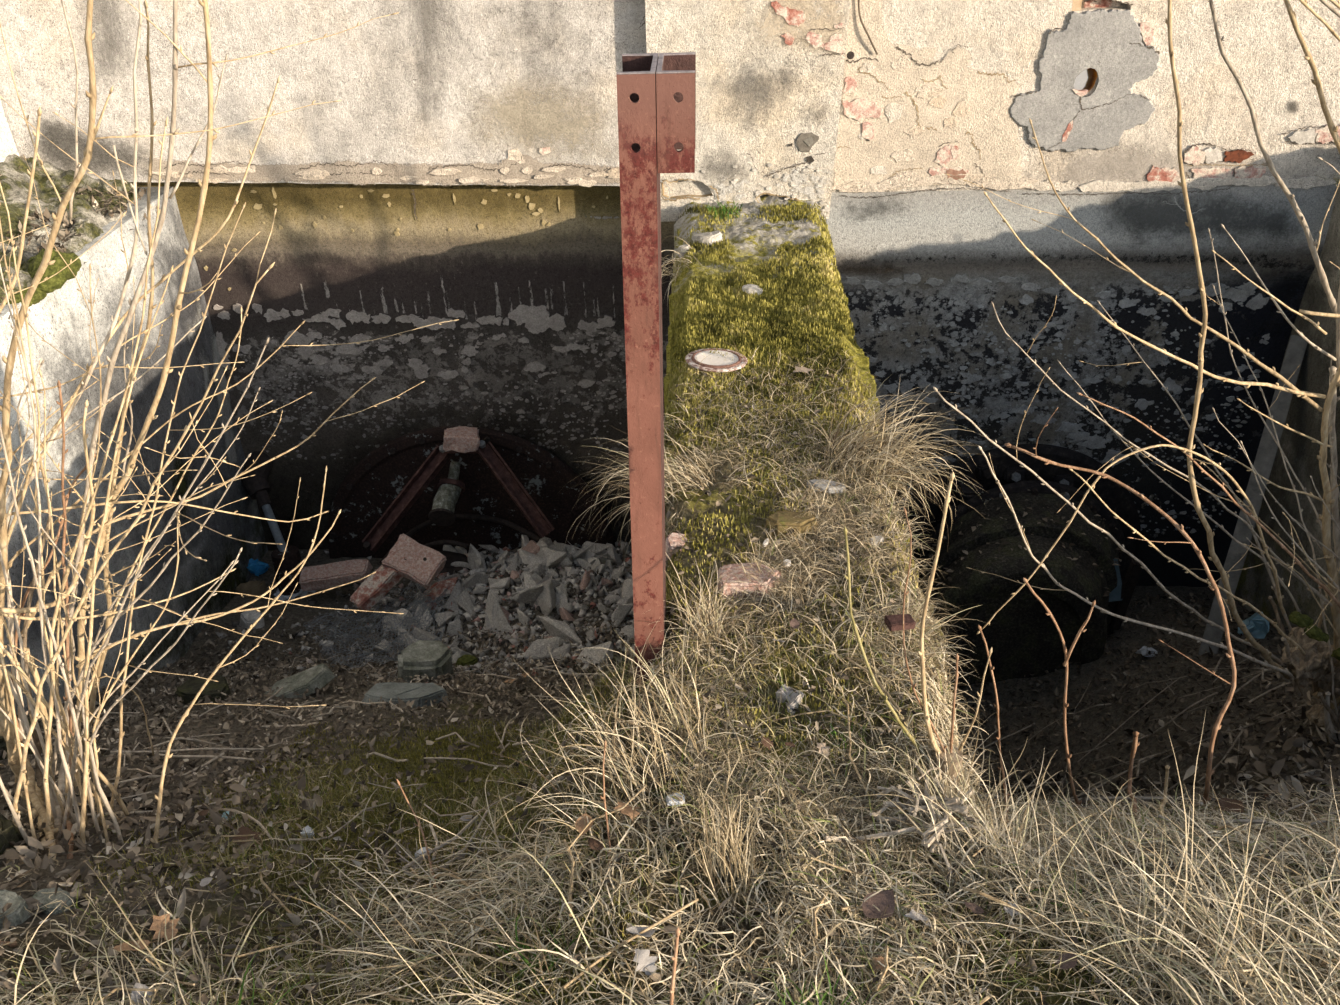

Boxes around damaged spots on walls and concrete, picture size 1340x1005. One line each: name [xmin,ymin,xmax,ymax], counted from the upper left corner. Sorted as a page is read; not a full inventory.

flaking render [762,0,1340,193]
damp [324,275,450,316]
peeling [213,287,627,460]
damp [494,281,615,318]
peeling [841,272,1270,533]